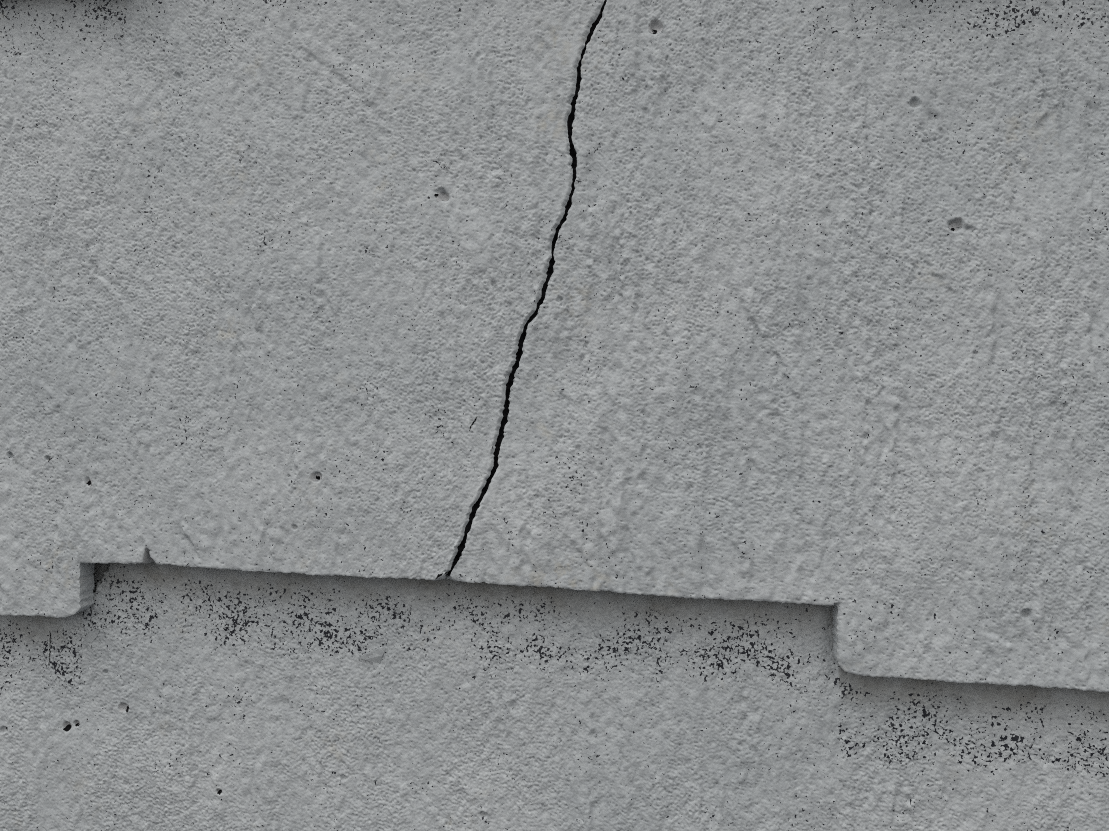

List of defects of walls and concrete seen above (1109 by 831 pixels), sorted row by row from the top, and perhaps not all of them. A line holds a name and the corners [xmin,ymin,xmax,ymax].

crack [436,0,607,579]